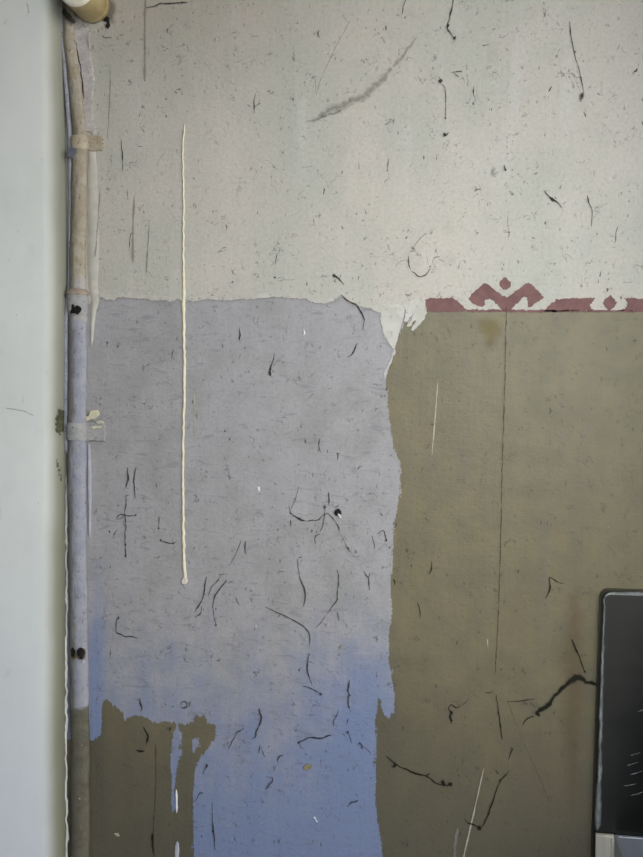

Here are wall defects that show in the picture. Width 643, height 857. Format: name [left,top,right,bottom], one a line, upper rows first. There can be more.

peeling [75,27,96,134]
peeling [97,292,333,304]
peeling [370,298,427,378]
crack [448,308,596,830]
crack [228,486,452,790]